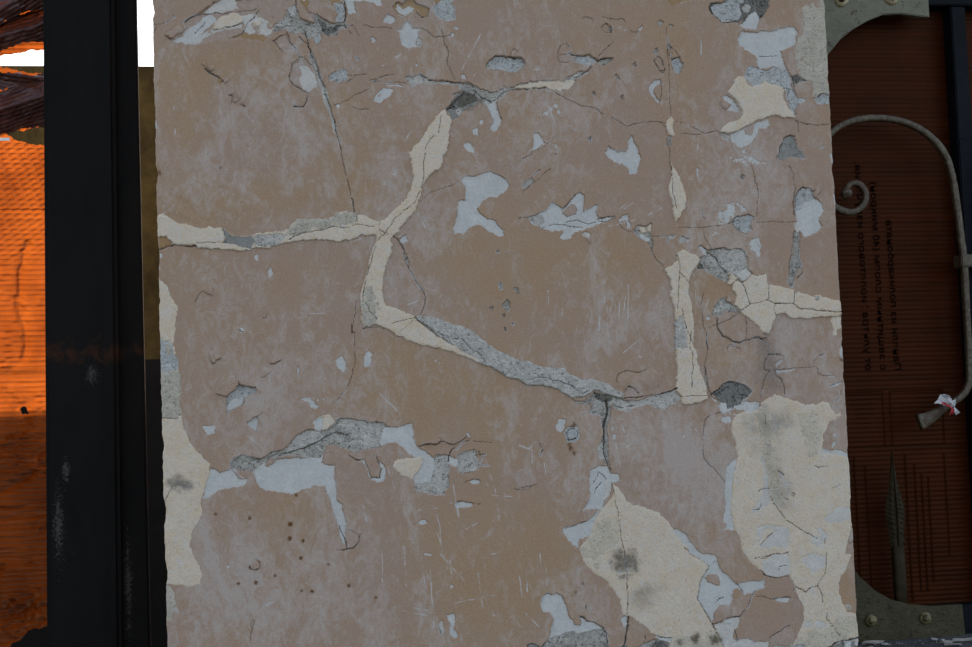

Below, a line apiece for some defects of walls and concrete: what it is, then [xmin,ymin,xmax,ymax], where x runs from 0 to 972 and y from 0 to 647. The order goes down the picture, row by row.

peeling [165,0,458,108]
crack [335,2,397,36]
crack [556,29,712,164]
flaking render [666,0,829,179]
crack [157,33,647,400]
peeling [453,172,509,237]
peeling [518,192,653,252]
crack [751,166,796,223]
crack [620,212,842,405]
flaking render [159,254,492,647]
flaking render [563,381,888,647]
spalling [527,593,608,647]